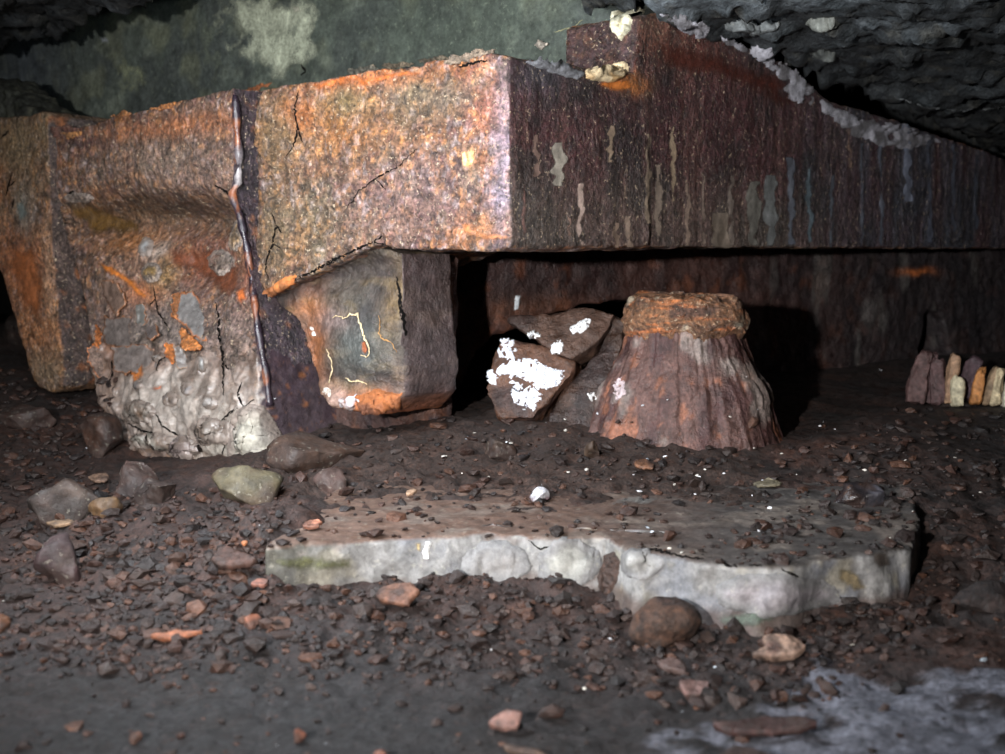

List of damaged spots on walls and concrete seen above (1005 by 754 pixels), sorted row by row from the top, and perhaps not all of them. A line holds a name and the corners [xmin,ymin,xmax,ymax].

rust [319,72,415,87]
rust [603,81,629,90]
crack [286,64,306,156]
rust [104,265,145,296]
rust [172,250,245,300]
crack [265,212,282,279]
rust [262,275,297,297]
crack [295,236,389,281]
crack [396,276,407,336]
crack [215,302,253,421]
crack [128,413,179,436]
rust [354,389,402,416]